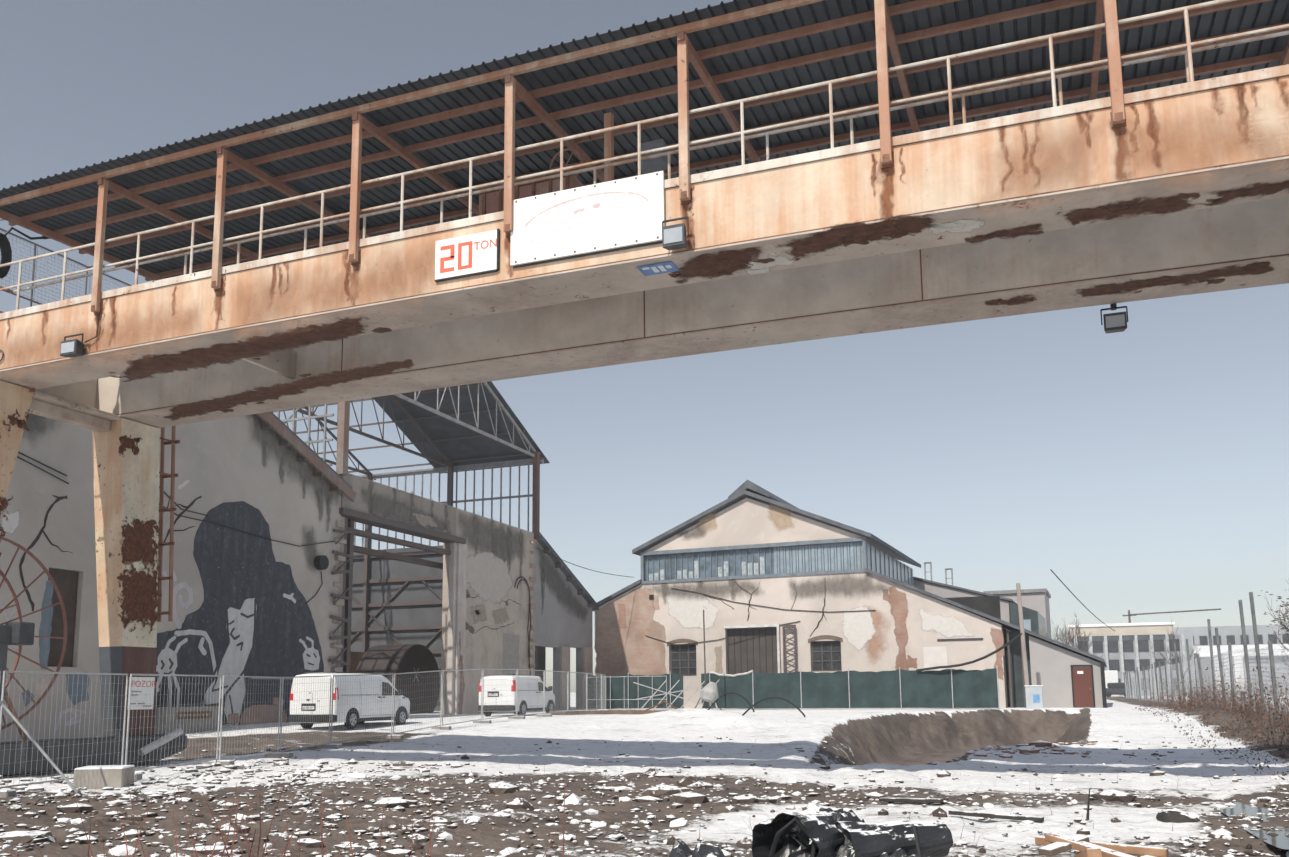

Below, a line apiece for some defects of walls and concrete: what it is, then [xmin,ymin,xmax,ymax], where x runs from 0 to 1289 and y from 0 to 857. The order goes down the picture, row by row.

corrosion [1113,83,1256,179]
corrosion [669,148,935,283]
corrosion [1065,180,1289,225]
corrosion [1076,262,1274,297]
corrosion [7,250,432,382]
corrosion [164,359,414,420]
crack [19,495,71,611]
crack [706,580,761,621]
crack [791,578,827,636]
peeling [842,606,876,650]
spalling [882,586,974,670]
spalling [990,628,1004,680]